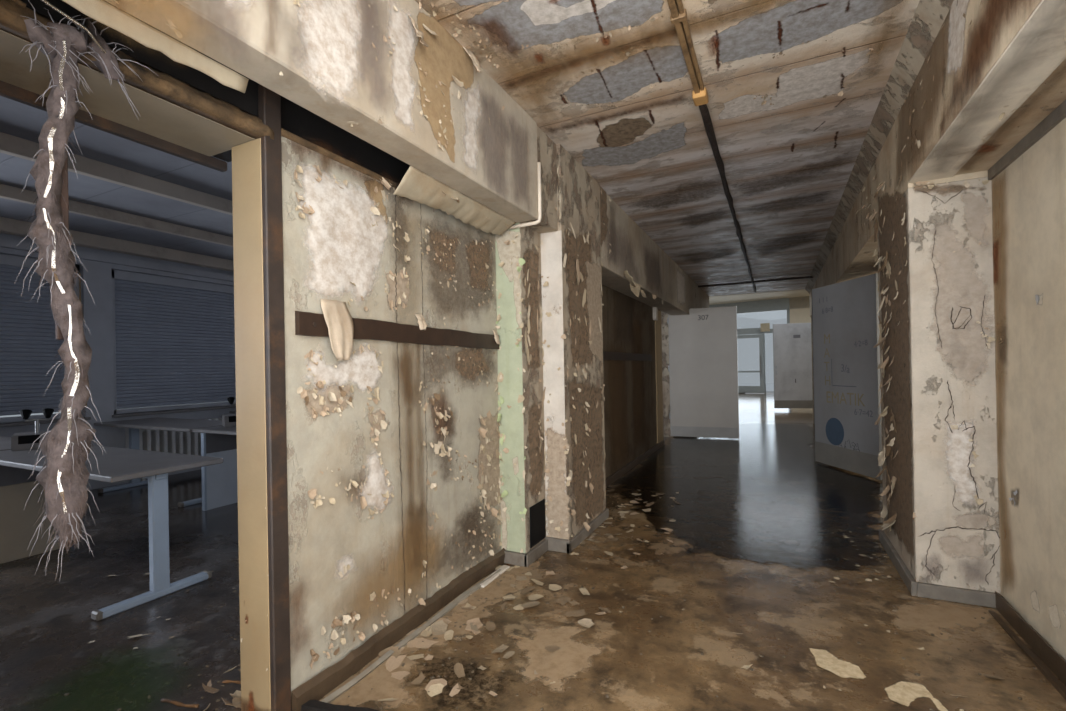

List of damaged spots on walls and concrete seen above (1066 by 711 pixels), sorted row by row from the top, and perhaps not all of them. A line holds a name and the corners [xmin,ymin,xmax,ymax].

spalling [408,0,664,163]
leakage [551,97,682,131]
spalling [563,46,688,107]
spalling [712,0,903,64]
leakage [964,105,1017,170]
peeling [297,292,390,443]
leakage [424,345,497,387]
peeling [419,118,687,556]
peeling [848,0,989,556]
crack [931,230,995,349]
crack [913,381,1000,583]
leakage [444,508,499,576]